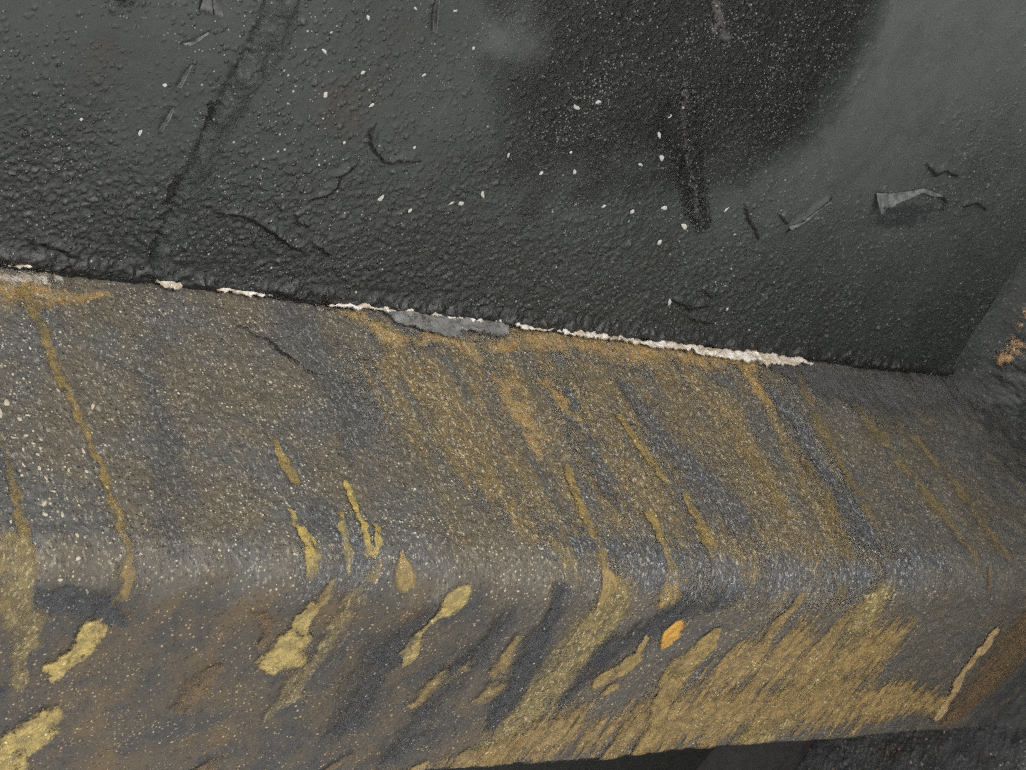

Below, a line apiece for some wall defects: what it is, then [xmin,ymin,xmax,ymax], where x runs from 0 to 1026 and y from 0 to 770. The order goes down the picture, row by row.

water stain [509,0,872,233]
peeling [876,188,944,215]
water stain [157,280,183,289]
water stain [217,288,273,297]
water stain [329,303,414,312]
crack [233,323,317,374]
corrosion [0,432,45,691]
corrosion [287,509,323,581]
corrosion [336,308,1026,770]
corrosion [42,618,108,683]
corrosion [253,579,335,676]
corrosion [0,706,64,770]